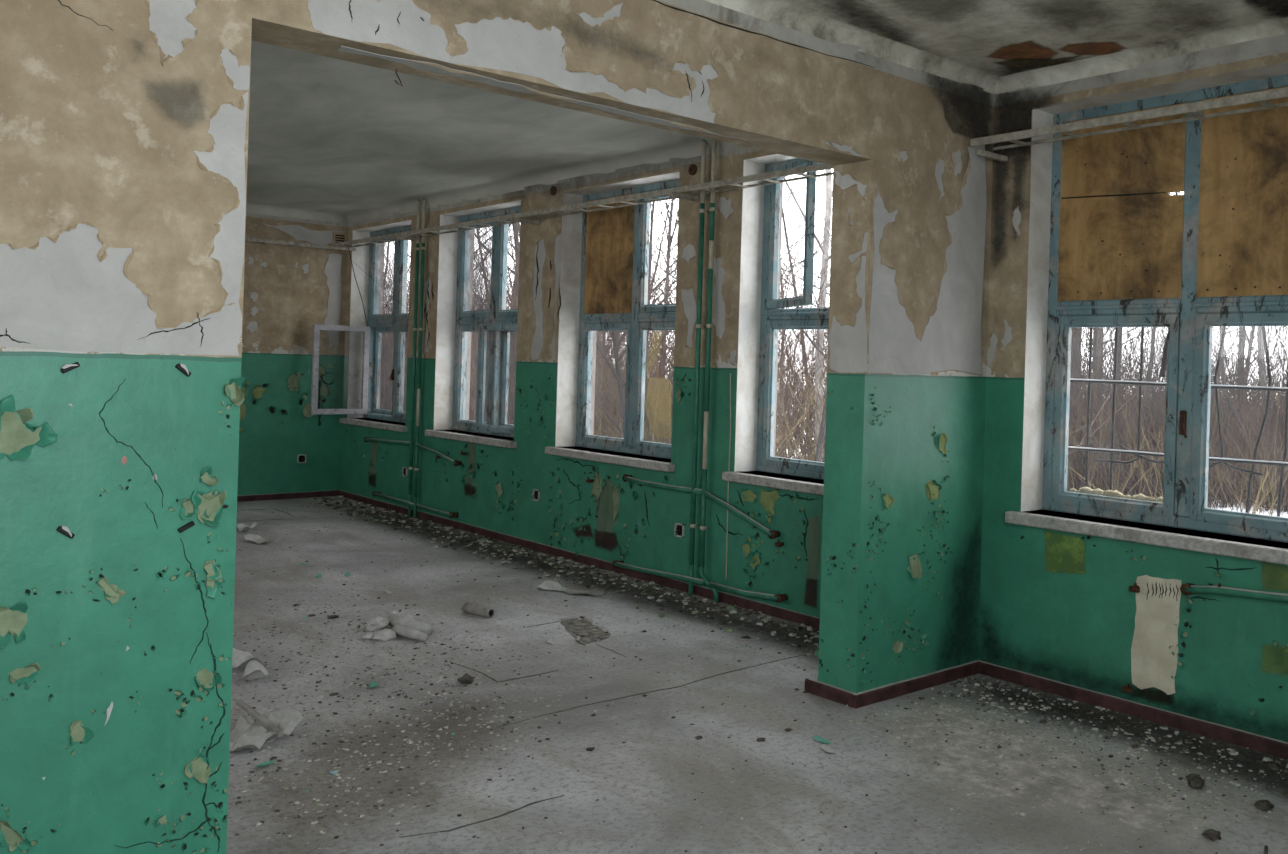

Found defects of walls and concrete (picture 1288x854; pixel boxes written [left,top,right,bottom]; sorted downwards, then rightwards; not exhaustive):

peeling [143,0,198,65]
peeling [308,0,753,144]
water stain [826,0,909,44]
water stain [1246,0,1288,17]
peeling [0,48,267,356]
peeling [218,223,346,435]
peeling [681,286,697,348]
peeling [820,91,1013,426]
peeling [0,395,58,461]
peeling [156,466,229,599]
crack [99,378,226,852]
peeling [145,654,231,854]